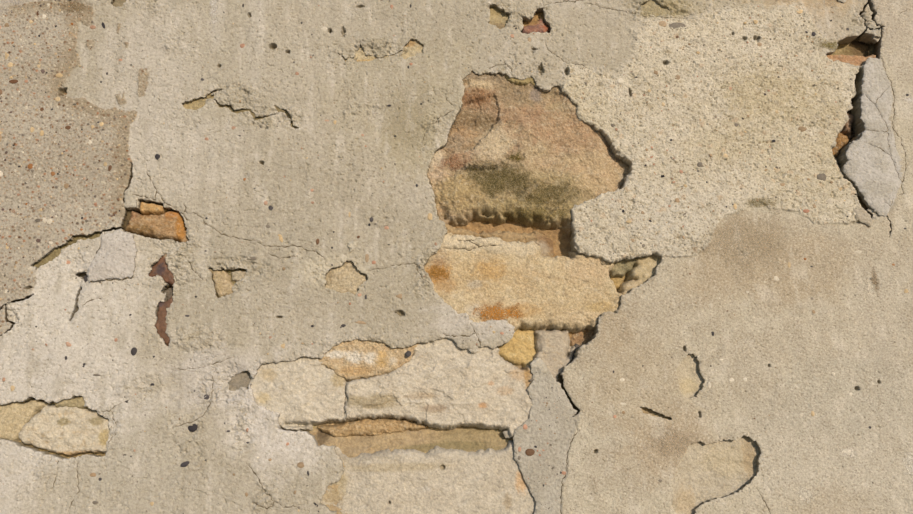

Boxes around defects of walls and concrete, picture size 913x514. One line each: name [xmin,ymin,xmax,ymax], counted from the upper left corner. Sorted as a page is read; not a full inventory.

spalling [521,7,551,34]
flaking render [826,28,905,227]
crack [843,0,907,237]
spalling [122,188,189,243]
crack [94,162,326,264]
crack [0,293,34,336]
spalling [148,253,175,346]
spalling [228,62,662,514]
spalling [0,395,110,459]
crack [557,373,580,514]
flaking render [640,407,672,420]
flaking render [671,435,761,514]